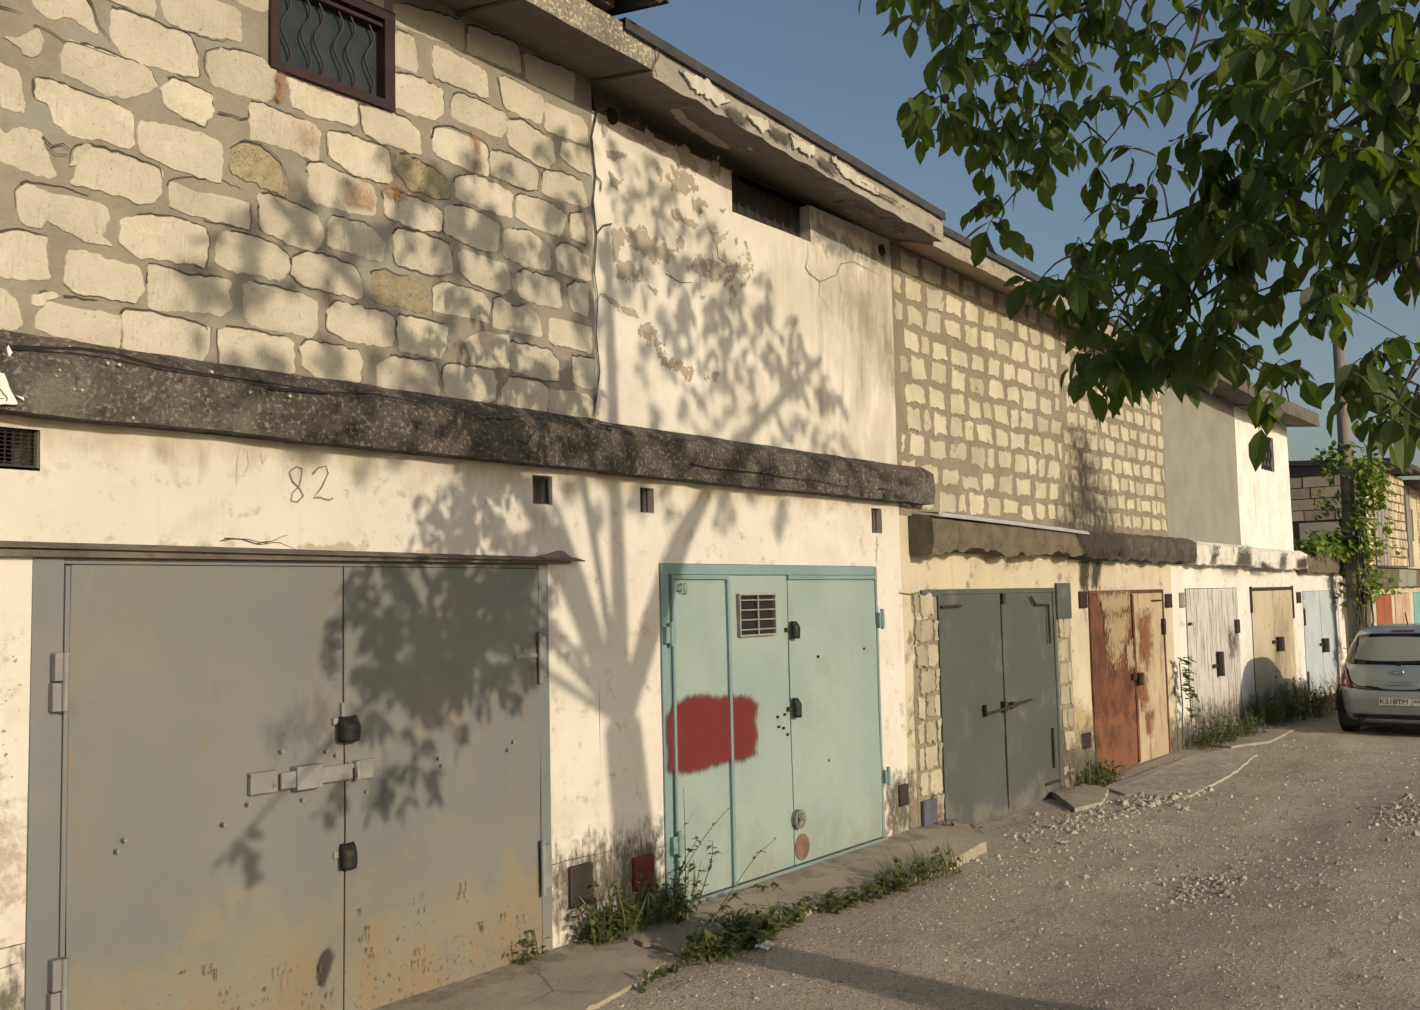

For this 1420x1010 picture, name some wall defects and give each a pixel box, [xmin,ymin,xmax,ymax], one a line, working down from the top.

peeling [602,116,627,190]
peeling [610,109,754,304]
peeling [678,70,731,107]
peeling [747,114,772,134]
spalling [788,133,914,235]
peeling [599,293,720,382]
crack [220,535,292,548]
water stain [1056,423,1131,591]
corrosion [1133,608,1155,738]
water stain [552,825,666,936]
water stain [0,951,25,1010]
corrosion [310,949,335,1010]